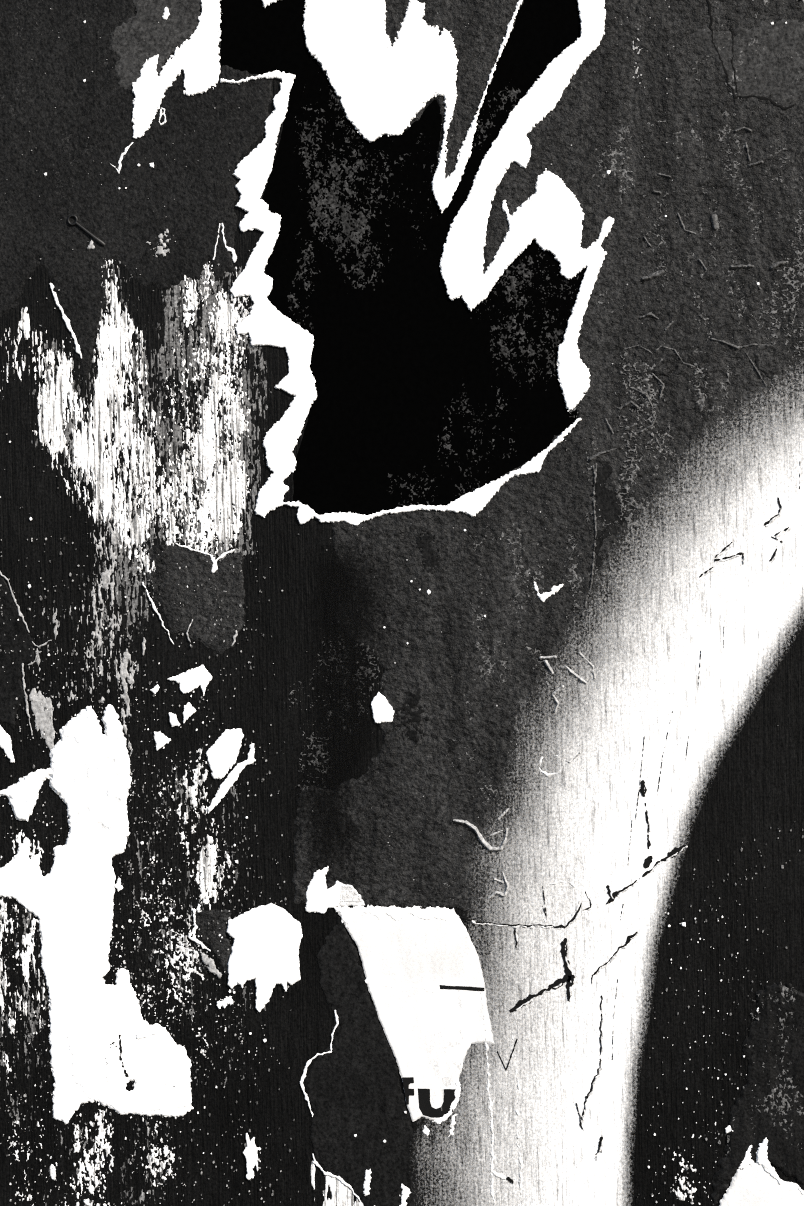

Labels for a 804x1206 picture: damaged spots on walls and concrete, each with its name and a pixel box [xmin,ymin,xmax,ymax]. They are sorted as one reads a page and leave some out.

peeling [146,229,170,257]
crack [699,474,800,577]
peeling [0,259,254,1206]
crack [460,712,689,1161]
peeling [243,1133,261,1180]